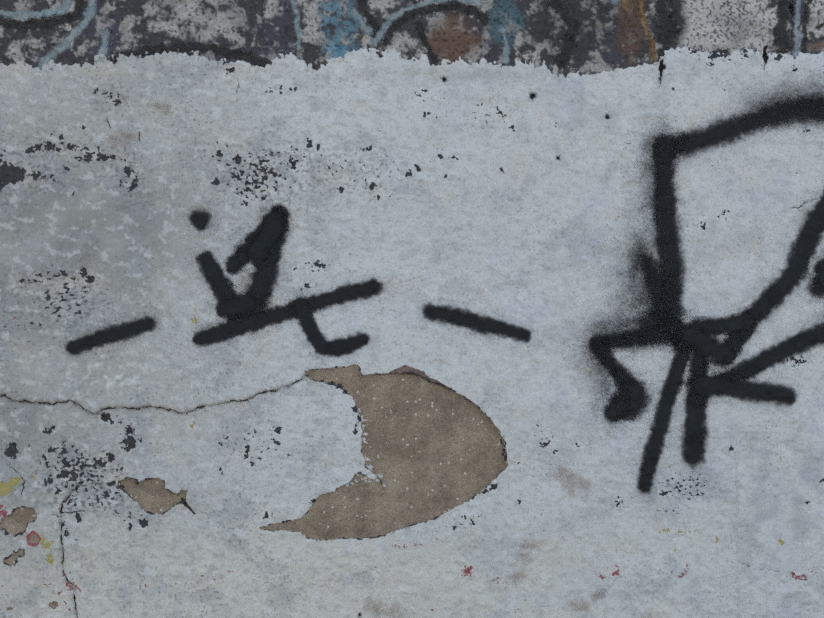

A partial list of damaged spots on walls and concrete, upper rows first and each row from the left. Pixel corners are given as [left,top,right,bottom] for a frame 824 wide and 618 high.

peeling [688,47,731,66]
crack [0,379,302,420]
peeling [1,442,21,459]
peeling [101,412,142,452]
peeling [218,426,283,469]
flaking render [259,364,508,541]
flaking render [40,441,195,531]
flaking render [0,477,55,566]
crack [56,483,100,618]